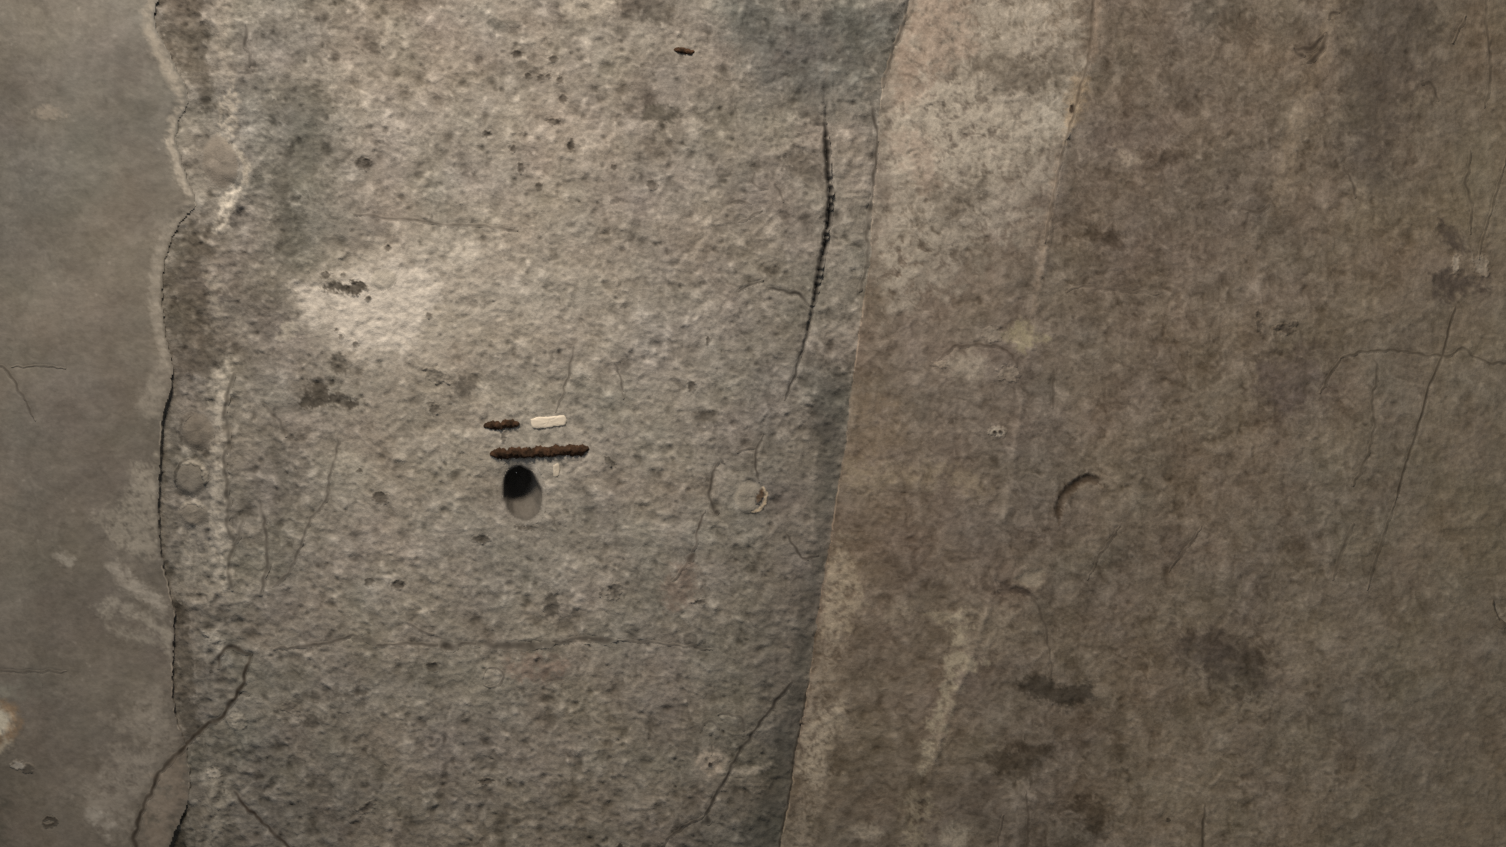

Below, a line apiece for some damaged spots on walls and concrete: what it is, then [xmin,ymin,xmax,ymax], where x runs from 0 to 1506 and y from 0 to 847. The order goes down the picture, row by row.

crack [1452,0,1492,108]
crack [730,0,909,400]
crack [1462,149,1506,259]
crack [672,433,764,582]
crack [785,532,819,561]
crack [1319,307,1506,590]
leakage [0,668,43,774]
crack [130,621,713,847]
crack [660,681,809,847]